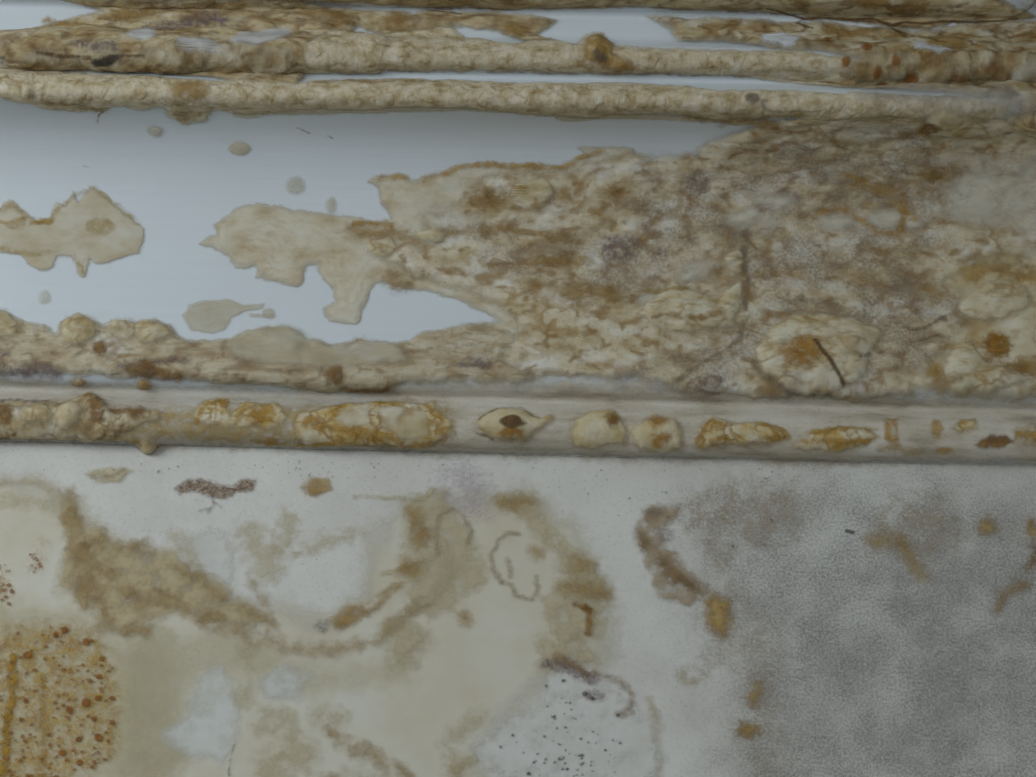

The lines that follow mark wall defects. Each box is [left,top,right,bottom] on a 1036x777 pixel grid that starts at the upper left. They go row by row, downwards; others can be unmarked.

peeling [0,0,1036,465]
rust [0,626,115,777]
damp [0,468,608,777]
damp [637,490,796,638]